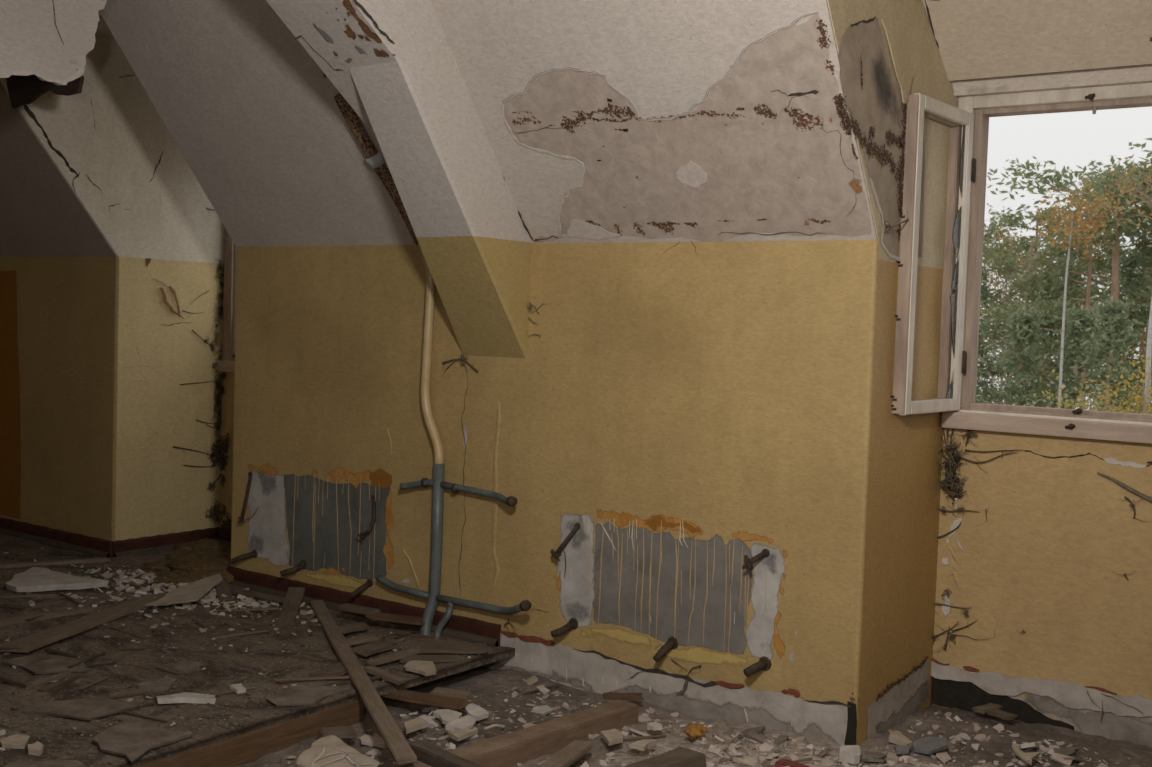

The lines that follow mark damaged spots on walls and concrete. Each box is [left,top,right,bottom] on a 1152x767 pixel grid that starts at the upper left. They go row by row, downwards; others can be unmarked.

spalling [0,68,85,85]
peeling [313,0,395,63]
crack [24,104,128,214]
flaking render [501,11,913,261]
peeling [0,270,21,519]
crack [1024,450,1152,468]
flaking render [493,497,1152,747]